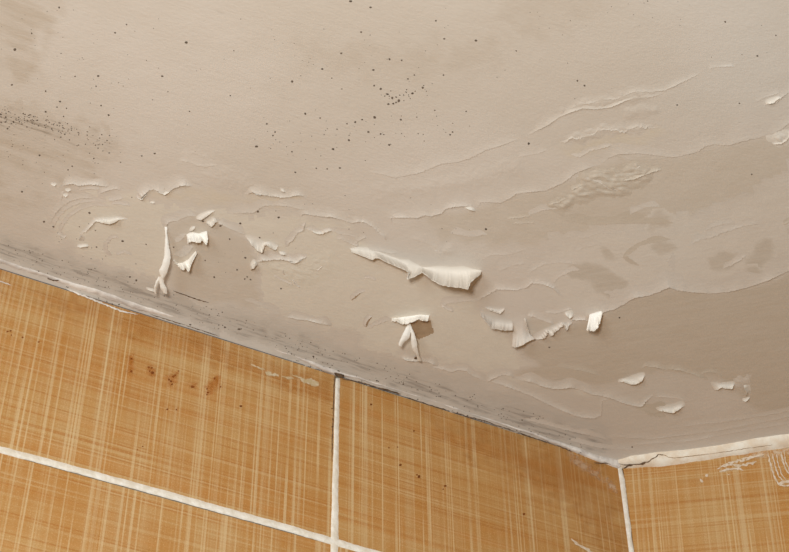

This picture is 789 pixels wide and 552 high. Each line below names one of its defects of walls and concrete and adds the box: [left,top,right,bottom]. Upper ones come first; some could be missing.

peeling [46,175,130,238]
peeling [77,216,128,248]
peeling [146,181,343,326]
peeling [350,244,789,348]
peeling [363,314,751,419]